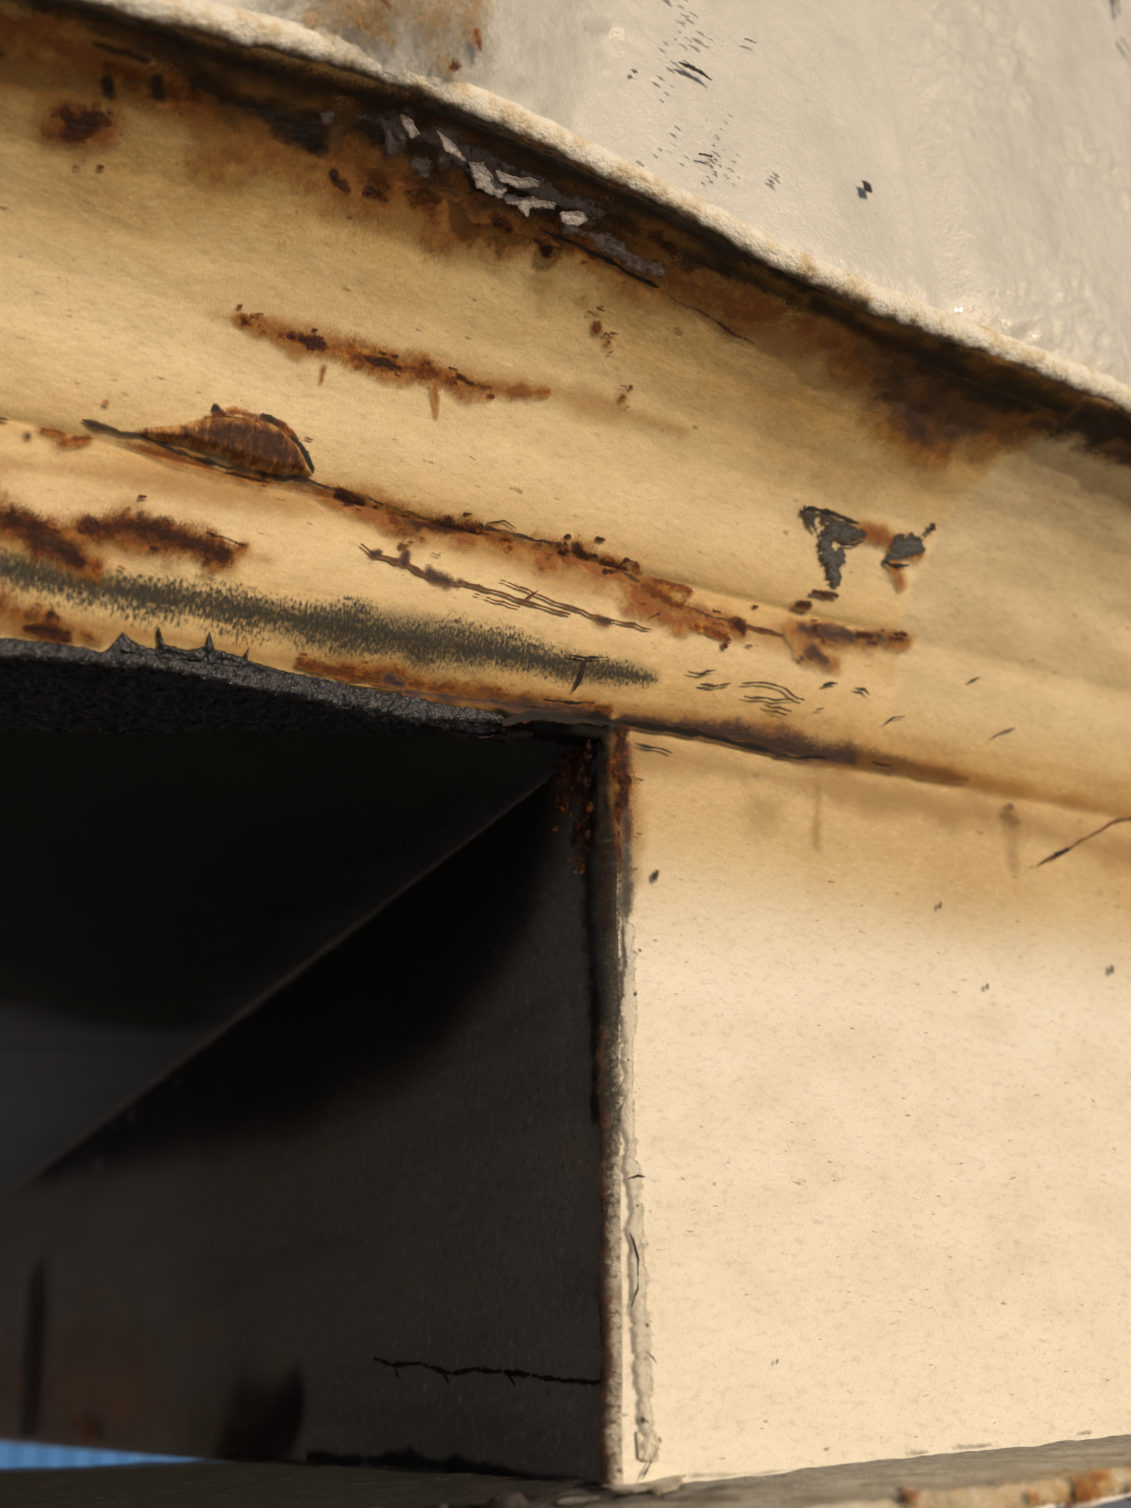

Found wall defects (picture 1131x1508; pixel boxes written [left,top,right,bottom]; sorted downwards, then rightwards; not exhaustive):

peeling [400,114,588,227]
corrosion [0,0,1131,470]
corrosion [0,492,249,605]
spalling [801,505,936,591]
corrosion [0,592,101,645]
crack [1040,817,1131,865]
corrosion [296,652,643,1207]
crack [372,1356,600,1386]
corrosion [894,1486,921,1508]
corrosion [1029,1469,1109,1508]